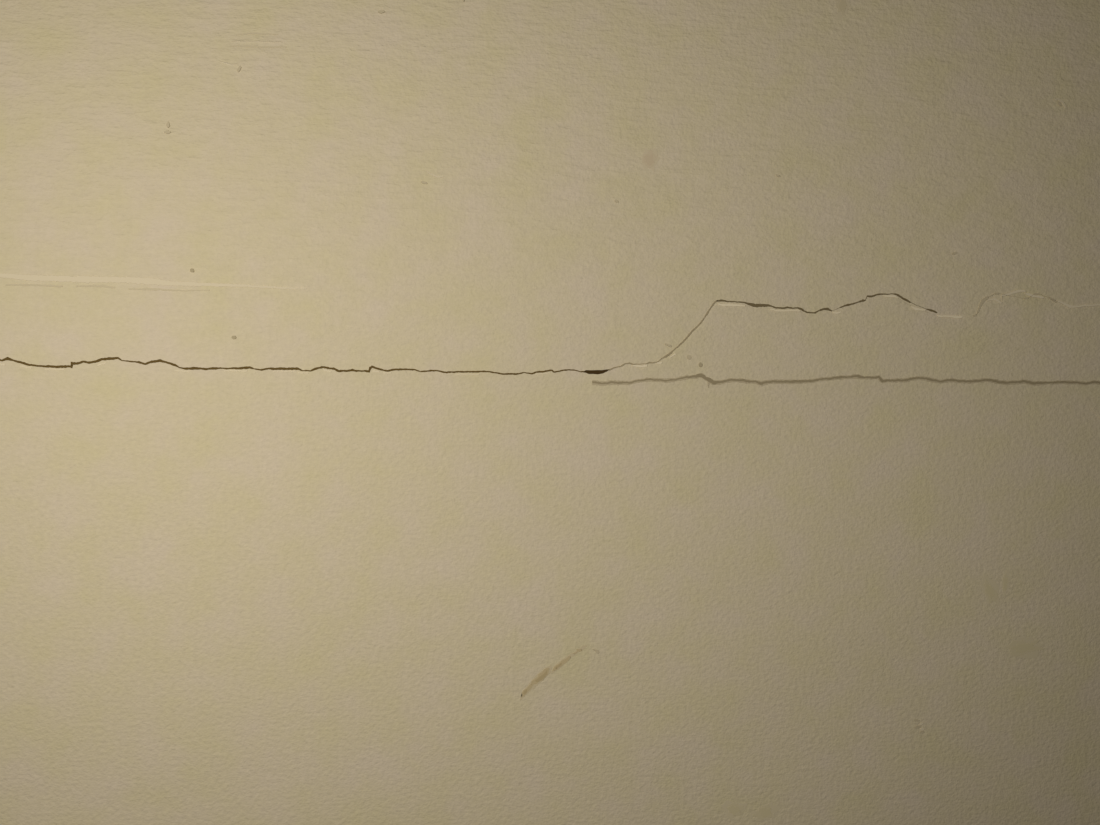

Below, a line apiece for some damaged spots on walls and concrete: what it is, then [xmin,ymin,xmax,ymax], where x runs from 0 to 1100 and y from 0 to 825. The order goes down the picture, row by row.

crack [0,293,1100,388]